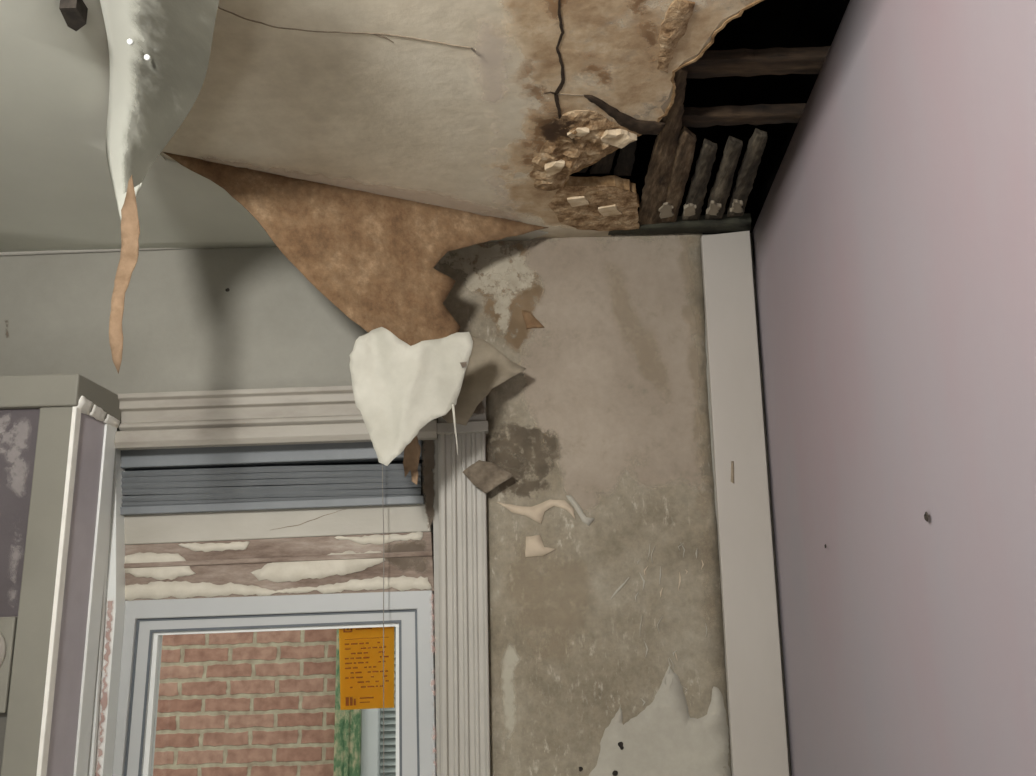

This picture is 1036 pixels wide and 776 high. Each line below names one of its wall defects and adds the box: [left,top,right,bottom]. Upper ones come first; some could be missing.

crack [218,7,482,57]
water stain [208,0,745,227]
crack [544,0,665,135]
spalling [657,0,695,73]
peeling [440,109,703,557]
peeling [0,415,29,496]
peeling [10,546,21,599]
peeling [96,532,434,776]
peeling [589,666,731,776]